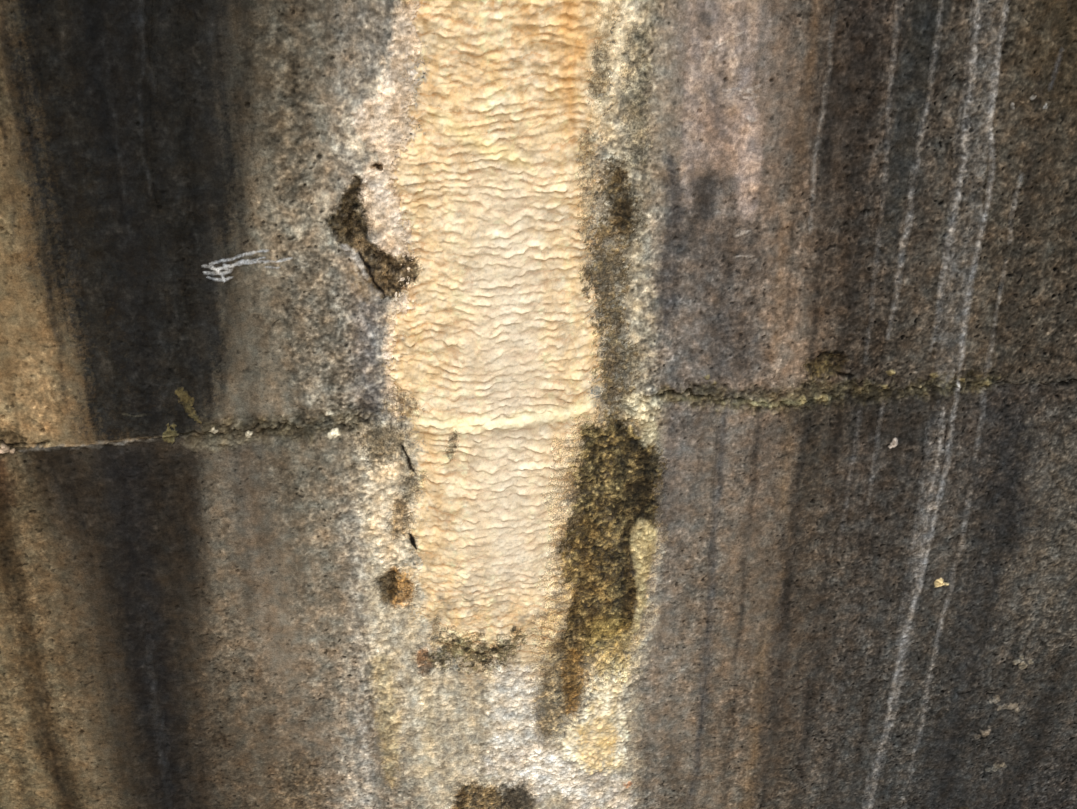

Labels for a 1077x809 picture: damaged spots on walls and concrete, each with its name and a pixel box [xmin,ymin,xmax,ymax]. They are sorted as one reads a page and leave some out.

water stain [0,0,262,809]
spalling [323,162,424,308]
spalling [373,564,418,610]
water stain [326,0,765,809]
water stain [719,402,886,809]
water stain [804,0,847,382]
water stain [837,0,1077,809]
crack [997,379,1077,390]